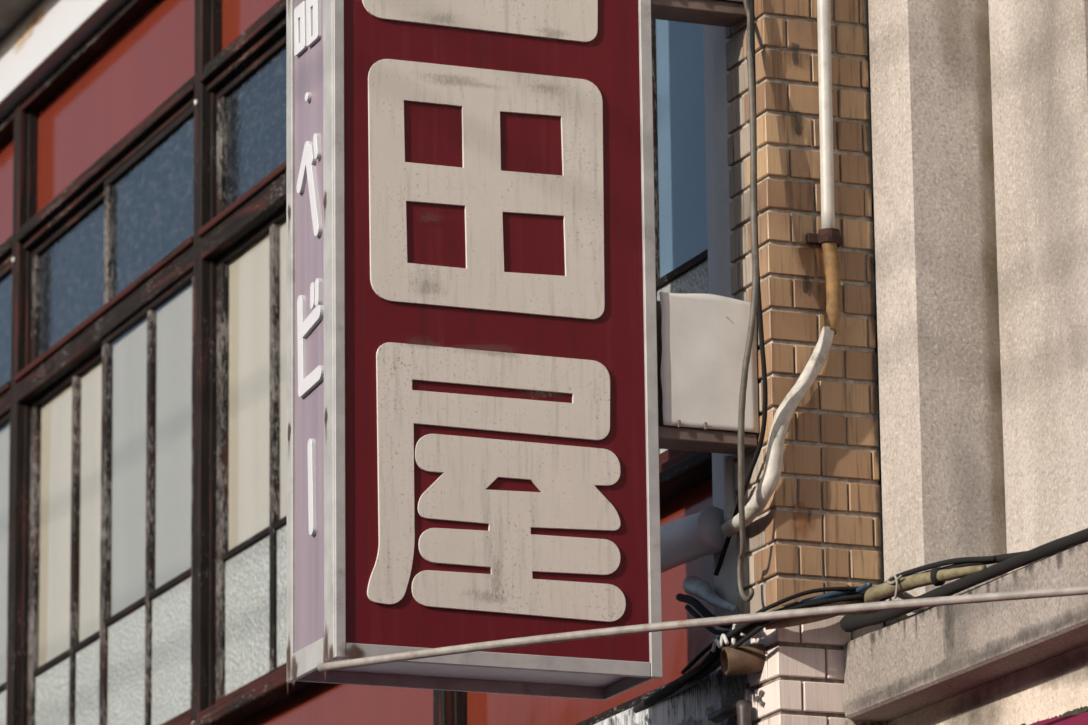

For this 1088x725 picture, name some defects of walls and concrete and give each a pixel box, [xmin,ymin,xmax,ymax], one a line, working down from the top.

water stain [668,669,746,725]